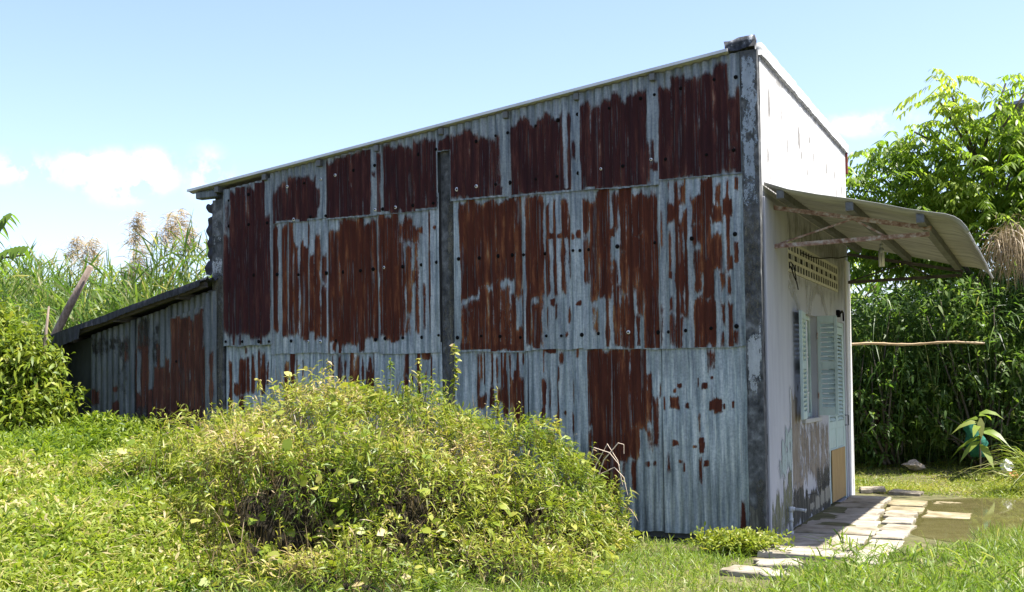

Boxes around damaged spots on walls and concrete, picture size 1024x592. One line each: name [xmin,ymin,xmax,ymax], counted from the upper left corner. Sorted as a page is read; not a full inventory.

corrosion [223,62,741,509]
corrosion [124,308,214,427]
peeling [747,319,762,395]
damp [749,466,831,539]